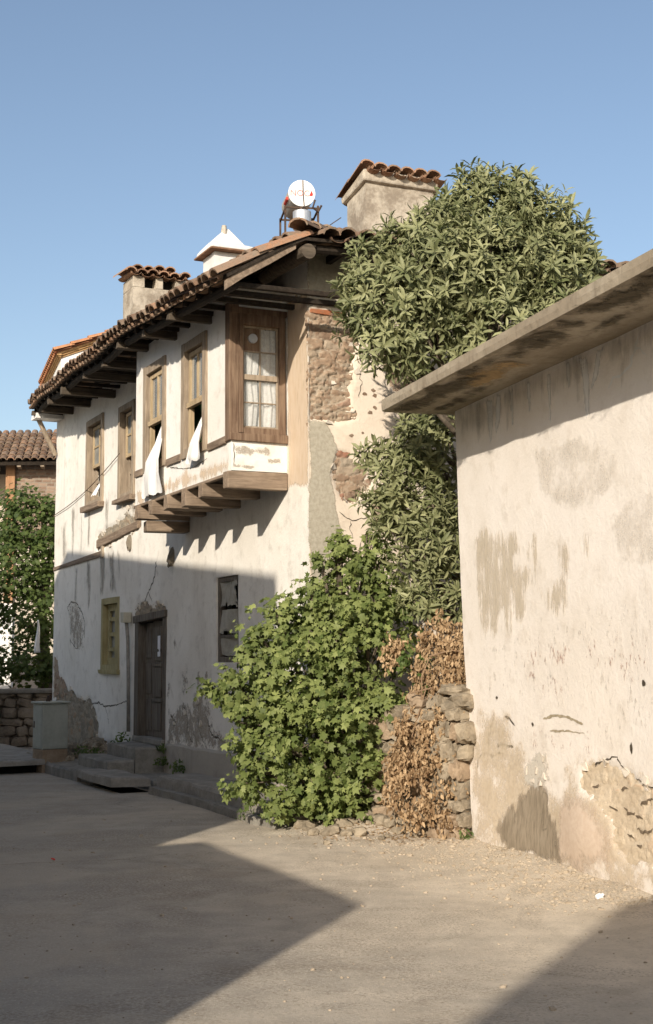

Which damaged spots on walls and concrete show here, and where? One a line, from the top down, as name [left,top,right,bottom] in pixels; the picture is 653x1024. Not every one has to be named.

flaking render [304,310,377,426]
flaking render [331,450,381,520]
peeling [67,601,85,649]
flaking render [53,657,99,744]
peeling [168,696,231,752]
leakage [497,784,560,862]
flaking render [580,758,653,866]